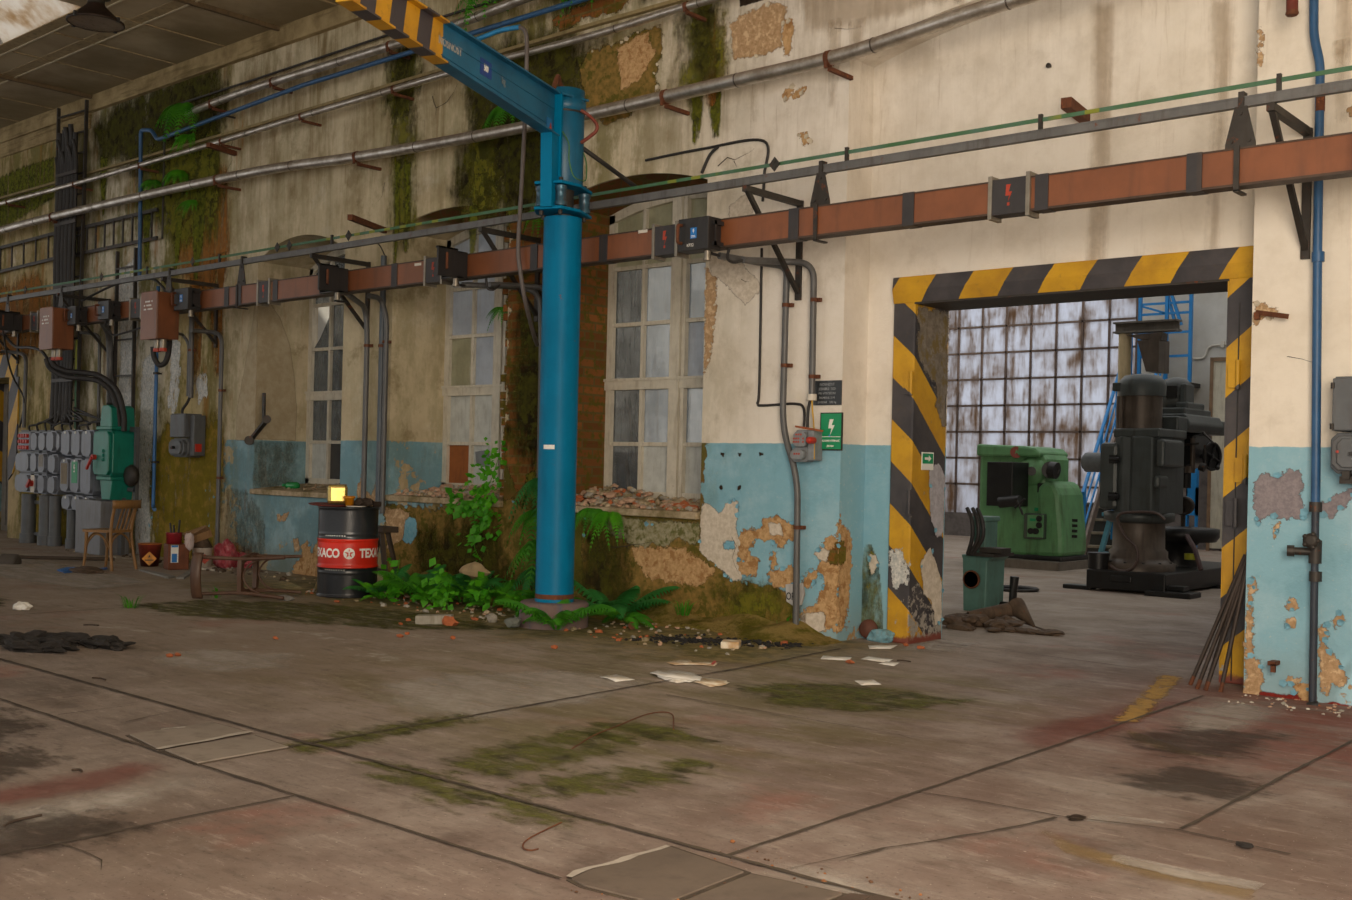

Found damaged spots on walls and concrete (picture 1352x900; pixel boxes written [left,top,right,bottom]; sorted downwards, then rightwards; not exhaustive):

spalling [729,0,794,60]
spalling [578,24,663,125]
leakage [689,91,721,143]
leakage [100,157,108,215]
leakage [142,199,151,263]
leakage [393,159,411,263]
peeling [1252,468,1352,540]
spalling [292,538,318,576]
spalling [578,463,946,634]
spalling [1242,576,1350,701]